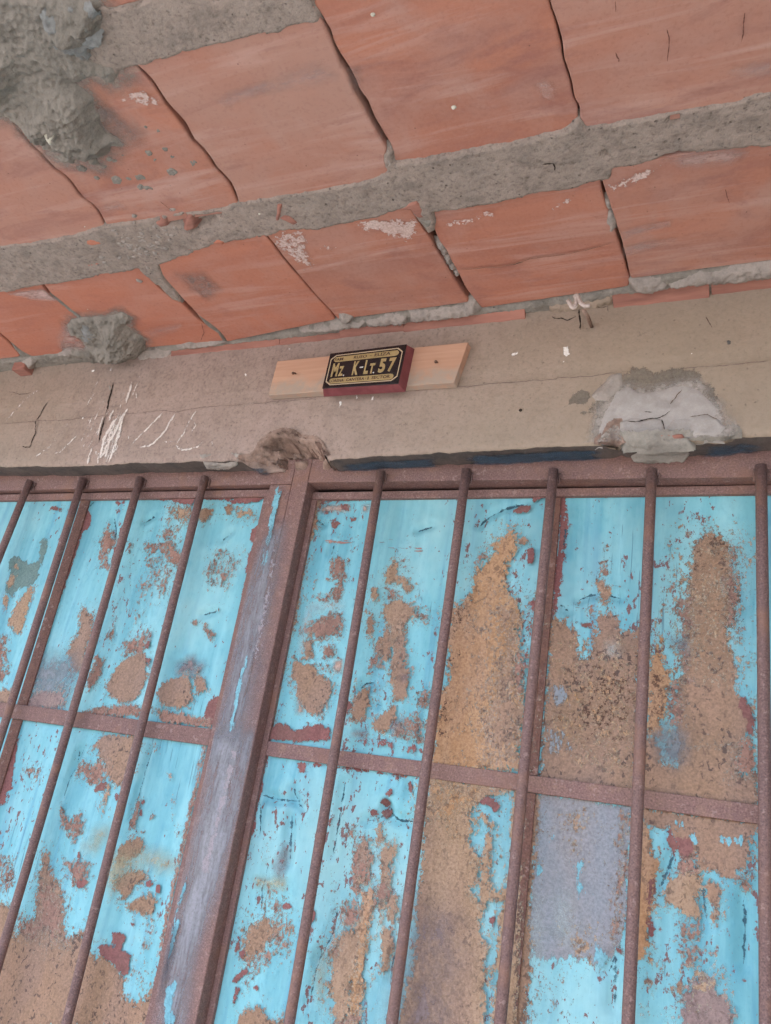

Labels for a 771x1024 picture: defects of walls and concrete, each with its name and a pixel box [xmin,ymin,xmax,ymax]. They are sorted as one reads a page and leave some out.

crack [14,392,46,448]
crack [99,385,113,440]
spalling [200,427,332,471]
spalling [594,418,626,447]